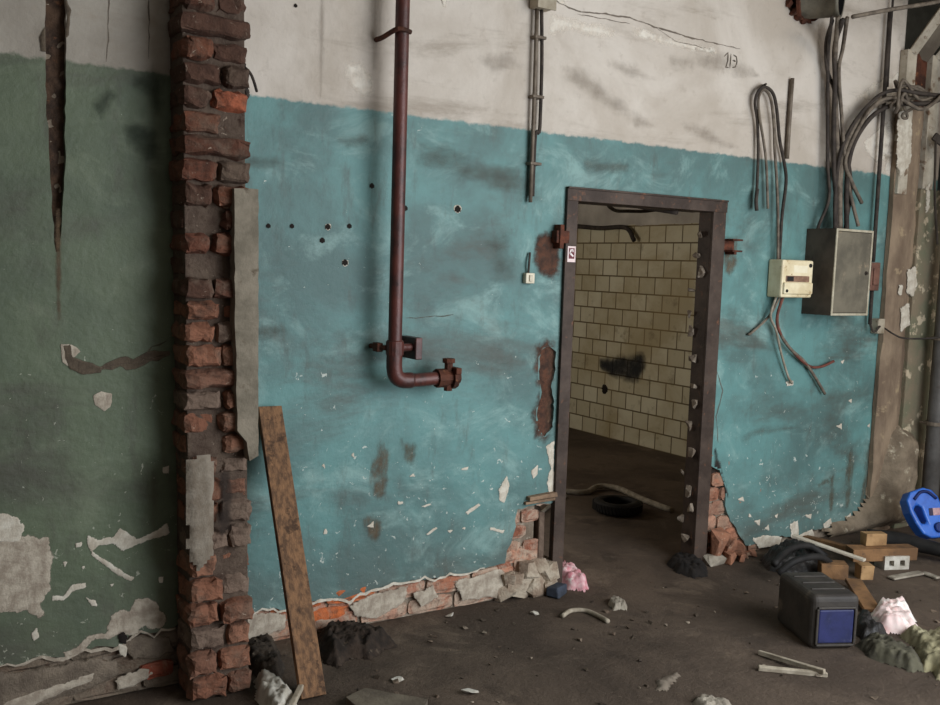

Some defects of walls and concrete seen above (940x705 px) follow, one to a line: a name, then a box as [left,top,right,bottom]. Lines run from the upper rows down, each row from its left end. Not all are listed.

crack [557,1,739,49]
corrosion [535,233,559,277]
spalling [312,340,560,632]
spalling [706,372,832,566]
peeling [0,513,97,641]
spalling [0,598,179,705]
peeling [75,523,170,586]
spalling [248,608,290,641]